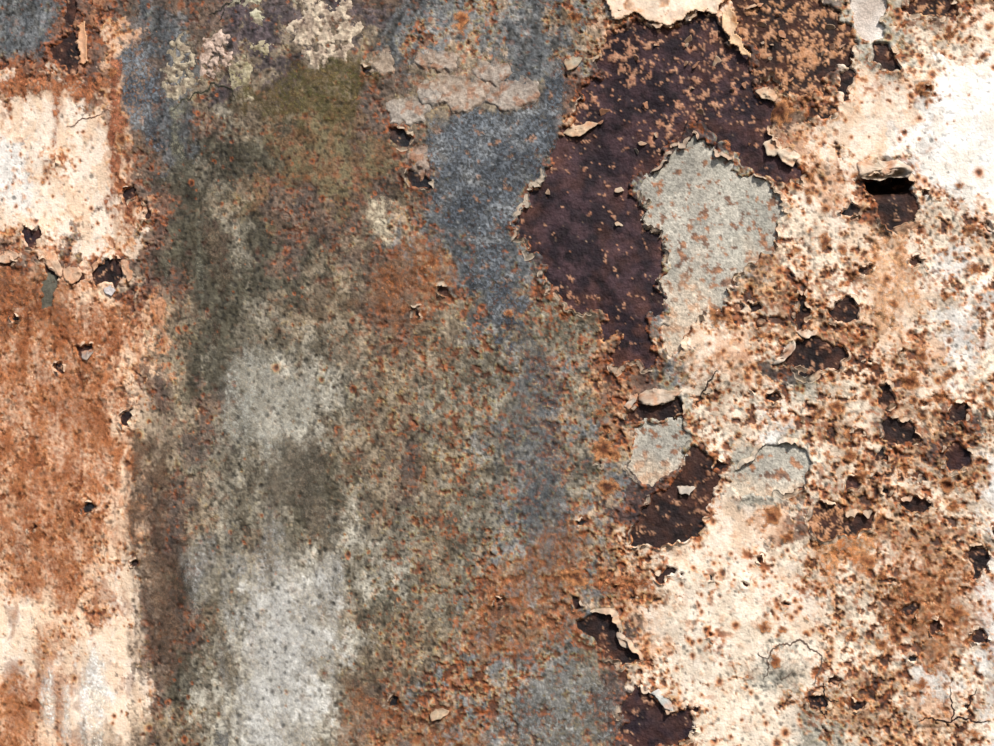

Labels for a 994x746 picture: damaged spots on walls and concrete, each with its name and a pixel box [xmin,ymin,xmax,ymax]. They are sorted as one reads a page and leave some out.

peeling [50,0,89,74]
leakage [366,196,393,244]
peeling [510,0,903,383]
peeling [857,158,934,199]
leakage [224,348,311,456]
corrosion [900,366,946,419]
corrosion [0,264,129,608]
peeling [628,442,765,552]
corrosion [762,508,793,543]
corrosion [938,476,960,511]
corrosion [758,611,787,633]
peeling [612,684,702,746]